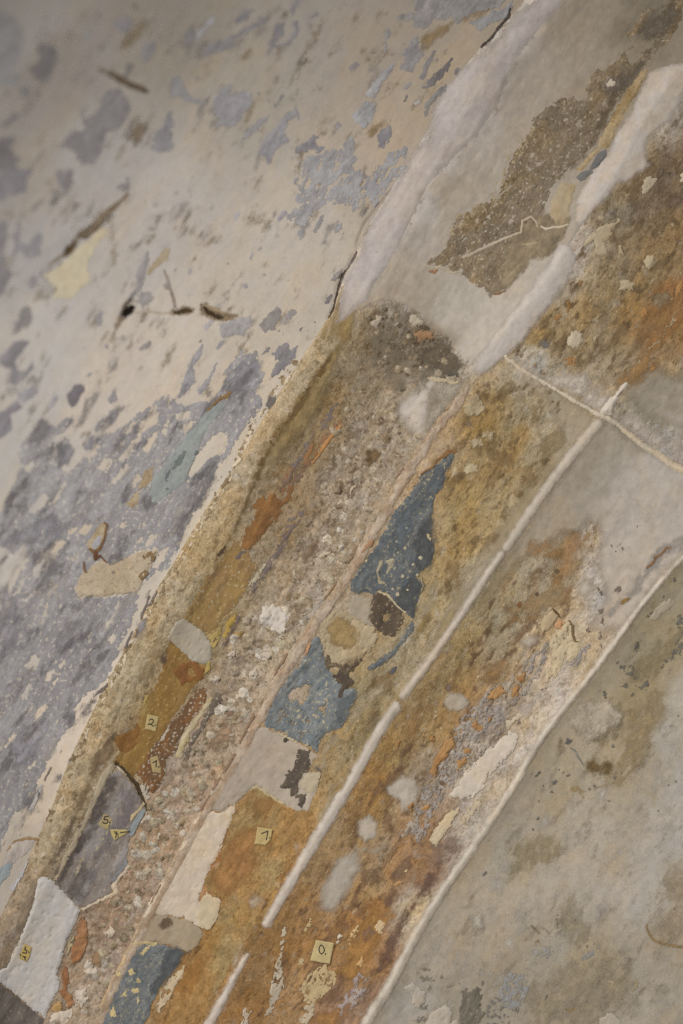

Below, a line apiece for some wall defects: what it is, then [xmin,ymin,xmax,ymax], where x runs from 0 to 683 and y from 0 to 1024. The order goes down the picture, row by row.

peeling [151,0,513,239]
leakage [420,23,451,50]
crack [480,7,511,48]
crack [325,222,373,341]
crack [424,215,569,275]
leakage [235,309,354,593]
leakage [413,243,683,649]
crack [115,762,148,811]
peeling [53,642,227,912]
peeling [0,306,316,851]
peeling [264,454,454,808]
peeling [397,608,592,846]